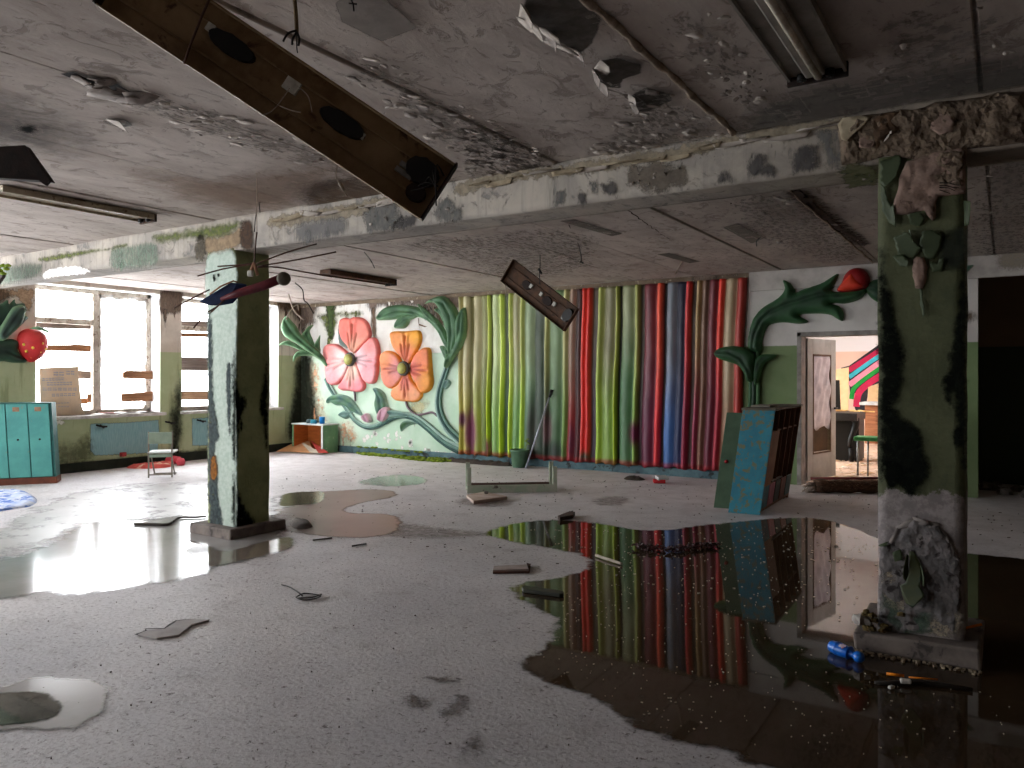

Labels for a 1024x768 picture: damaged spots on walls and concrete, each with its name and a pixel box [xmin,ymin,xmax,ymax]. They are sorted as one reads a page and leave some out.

peeling [104,118,132,132]
peeling [267,197,416,234]
spalling [345,0,1024,318]
leakage [156,176,380,527]
mould [876,249,929,496]
leakage [942,281,975,469]
spalling [878,516,962,634]